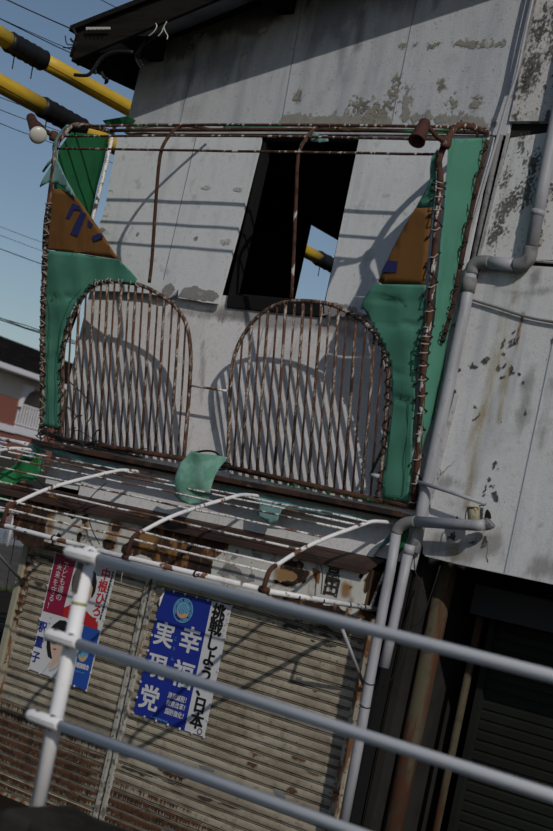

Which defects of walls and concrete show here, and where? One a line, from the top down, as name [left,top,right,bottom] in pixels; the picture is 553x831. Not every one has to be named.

damp [514,6,553,103]
peeling [280,72,497,130]
peeling [487,135,542,251]
peeling [496,331,524,385]
rust [12,483,88,621]
rust [103,514,229,574]
rust [274,558,320,587]
rust [268,594,363,619]
rust [359,569,373,593]
rust [0,700,46,801]
rust [46,732,216,831]